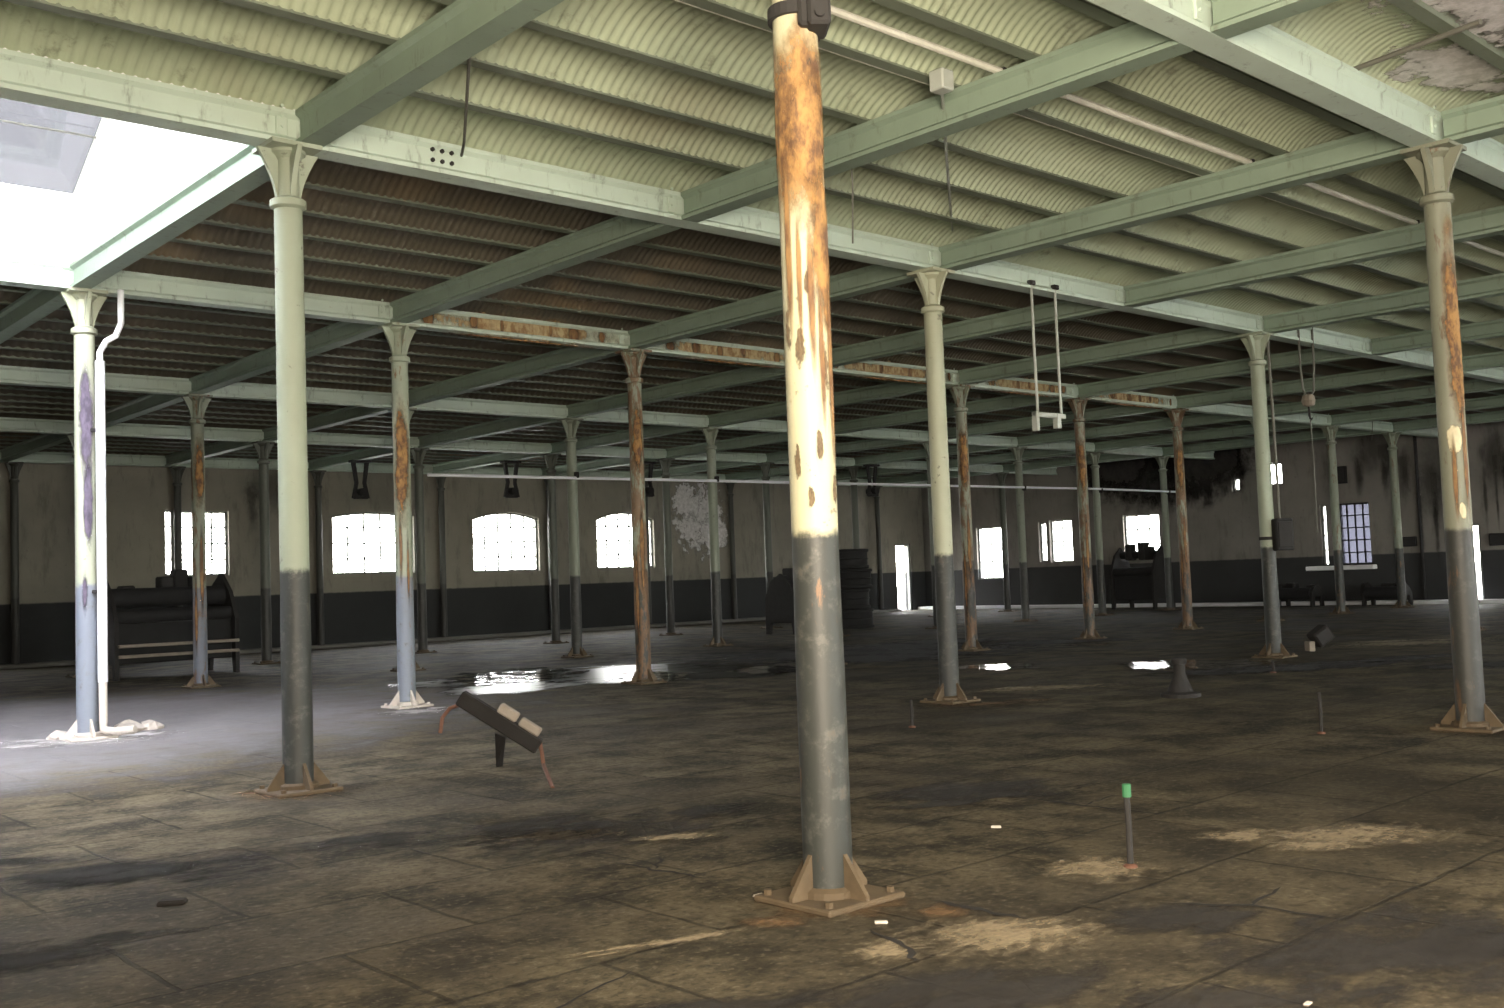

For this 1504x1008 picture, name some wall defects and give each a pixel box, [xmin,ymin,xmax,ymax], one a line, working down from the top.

peeling [1385,0,1504,93]
rust [774,17,927,444]
rust [422,312,609,348]
rust [666,342,785,368]
rust [1441,221,1469,512]
rust [632,407,643,472]
rust [960,431,969,486]
rust [1078,439,1086,492]
rust [1176,447,1184,487]
rust [395,410,410,594]
rust [635,508,645,635]